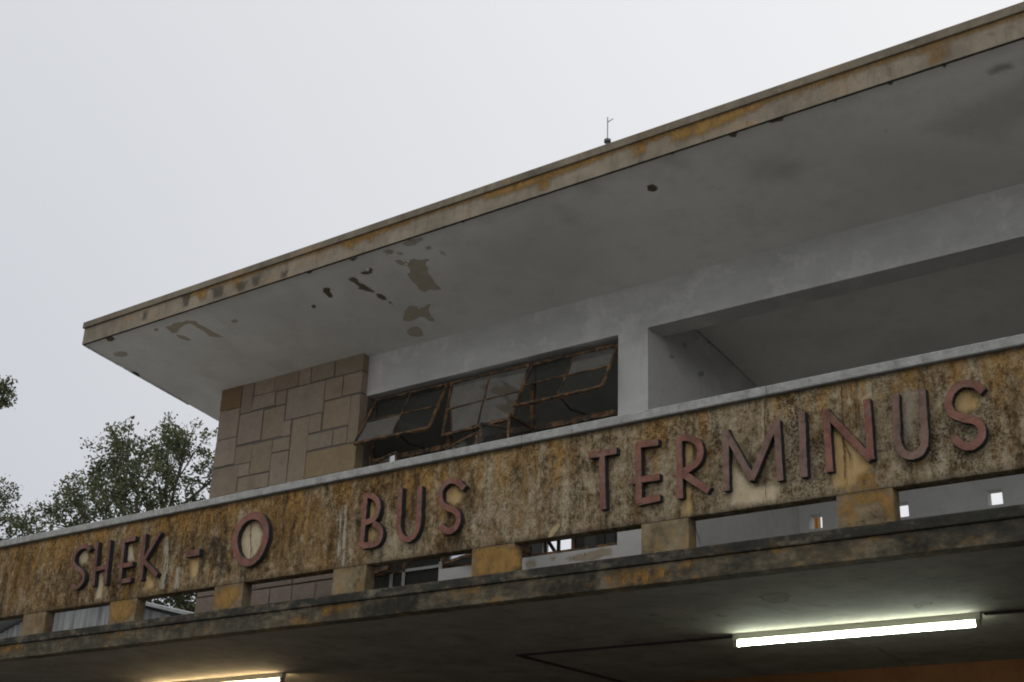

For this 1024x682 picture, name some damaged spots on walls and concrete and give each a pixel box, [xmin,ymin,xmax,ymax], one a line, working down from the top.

rust [188,12,1024,299]
peeling [349,268,392,304]
peeling [384,238,440,292]
peeling [154,321,222,340]
peeling [403,304,434,337]
damp [684,487,695,515]
efflorescence [337,505,347,566]
damp [160,537,180,589]